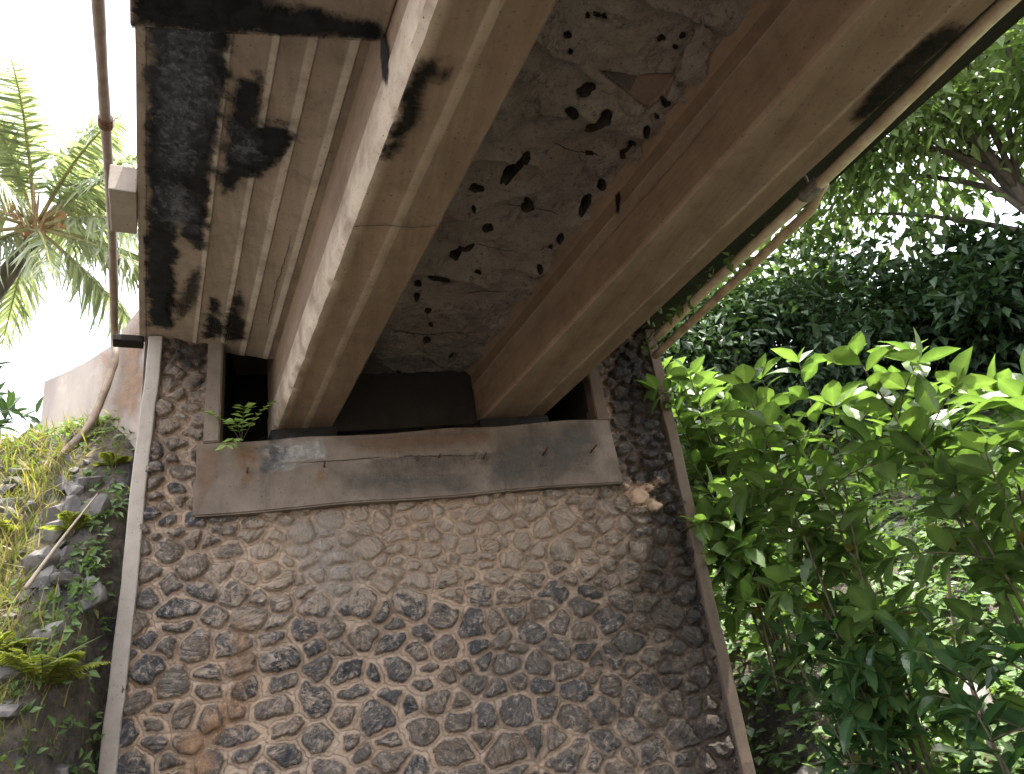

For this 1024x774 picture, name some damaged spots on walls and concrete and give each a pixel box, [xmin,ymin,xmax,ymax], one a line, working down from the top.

spalling [380,34,388,84]
mould [379,60,450,161]
spalling [600,70,675,159]
hole [657,32,686,50]
water stain [852,25,967,123]
mould [130,0,382,373]
hole [579,179,606,218]
hole [414,280,433,344]